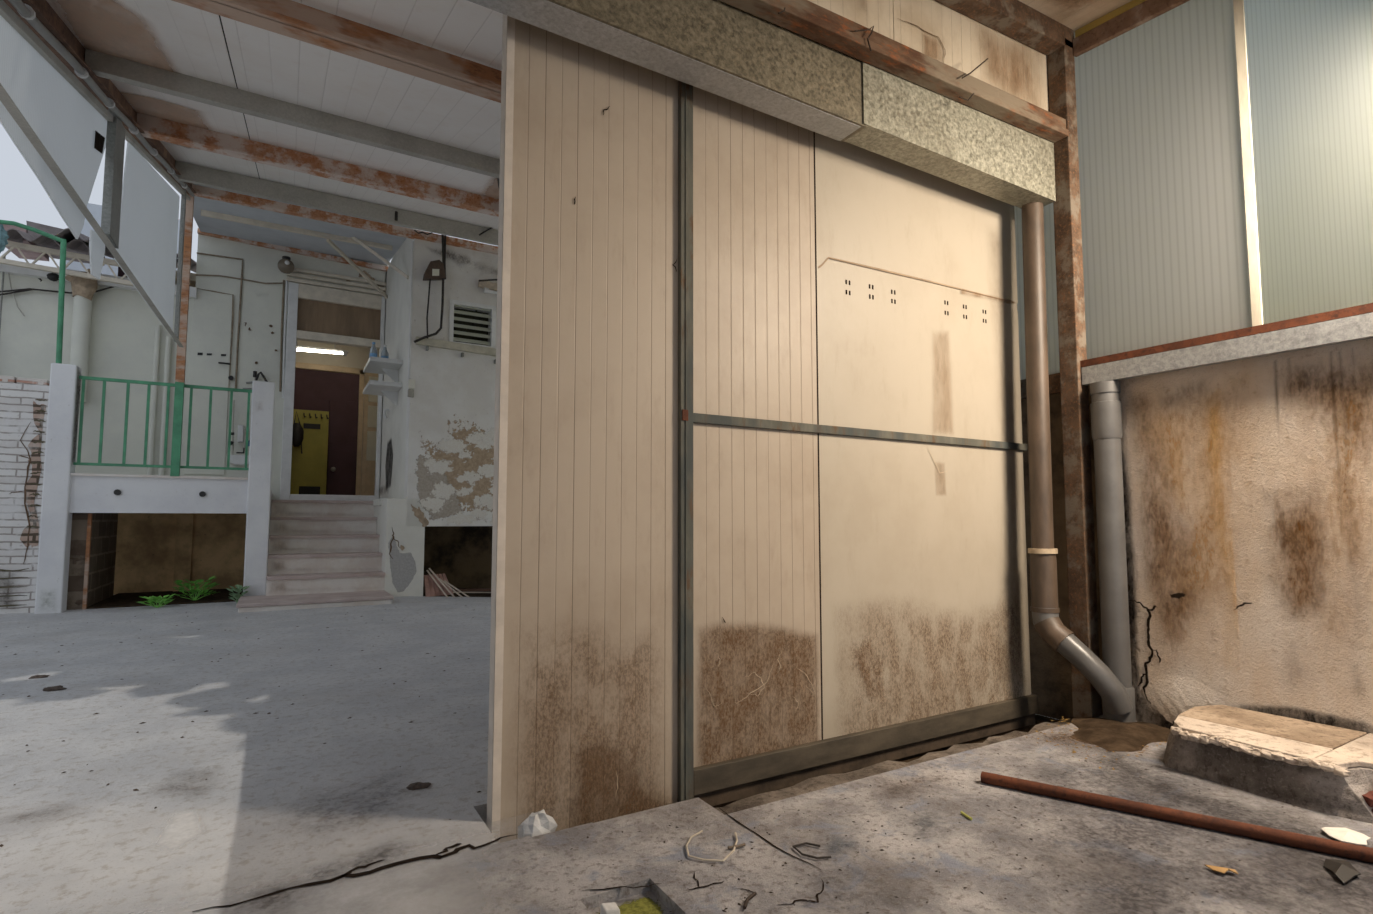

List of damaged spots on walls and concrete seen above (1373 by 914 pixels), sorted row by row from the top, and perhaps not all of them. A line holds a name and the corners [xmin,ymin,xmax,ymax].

spalling [20,399,47,547]
peeling [411,415,494,527]
water stain [1291,375,1367,514]
peeling [388,537,416,592]
crack [1134,600,1161,704]
water stain [1122,464,1174,729]
water stain [1149,494,1218,624]
water stain [1276,507,1322,610]